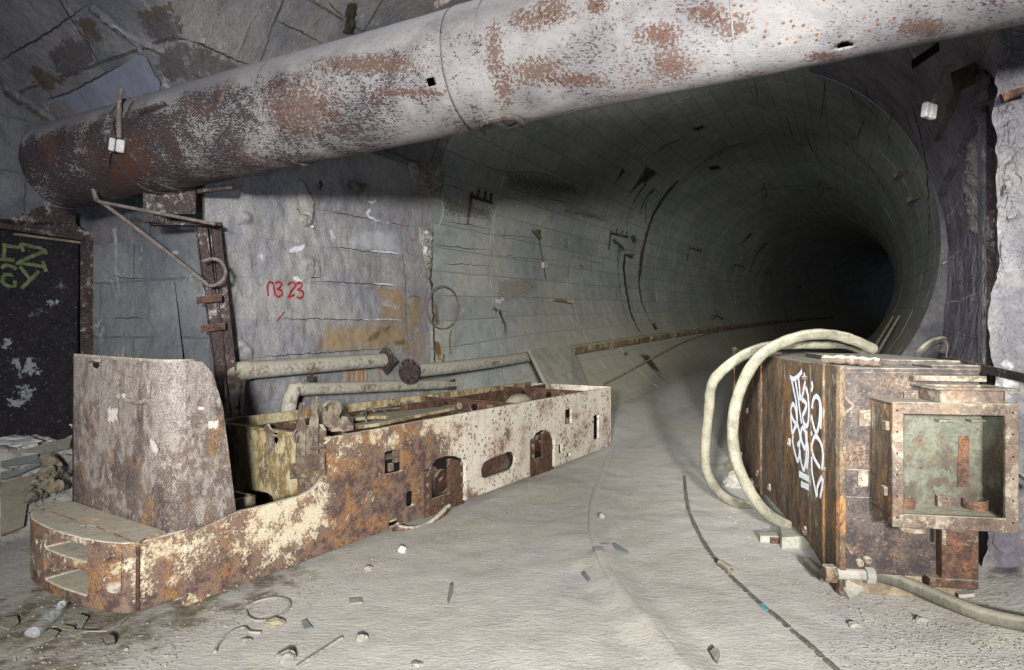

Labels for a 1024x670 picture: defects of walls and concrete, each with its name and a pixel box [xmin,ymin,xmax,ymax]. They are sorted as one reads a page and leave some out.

water stain [138,1,175,21]
rust [321,288,421,349]